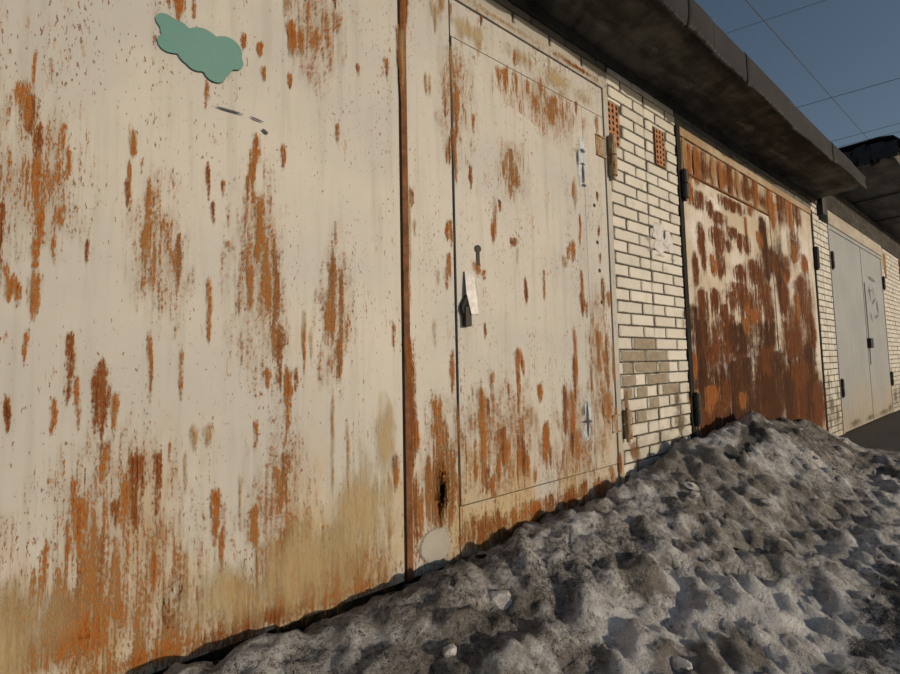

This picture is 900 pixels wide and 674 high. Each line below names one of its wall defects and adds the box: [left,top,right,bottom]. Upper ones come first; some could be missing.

corrosion [167,0,197,21]
corrosion [241,32,266,81]
corrosion [284,0,354,97]
corrosion [384,0,409,92]
corrosion [420,0,513,189]
corrosion [489,49,599,241]
corrosion [439,219,454,288]
corrosion [563,215,582,266]
corrosion [682,137,828,438]
corrosion [392,270,623,567]
corrosion [388,453,401,492]